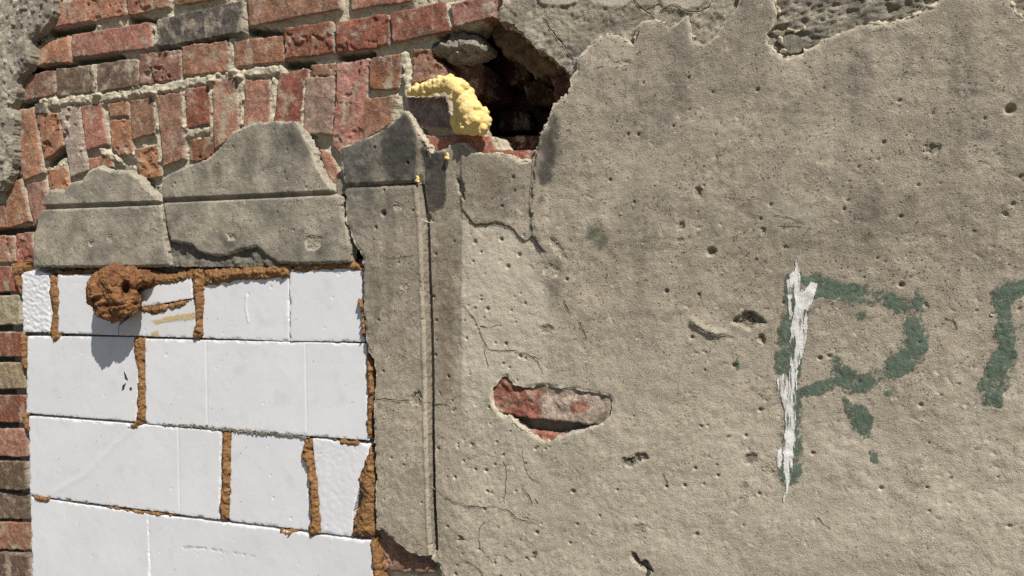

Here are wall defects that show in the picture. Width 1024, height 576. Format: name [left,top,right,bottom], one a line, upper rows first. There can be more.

flaking render [768,0,944,59]
spalling [432,0,739,151]
crack [461,158,546,254]
flaking render [167,227,350,269]
crack [465,306,543,373]
flaking render [489,376,613,441]